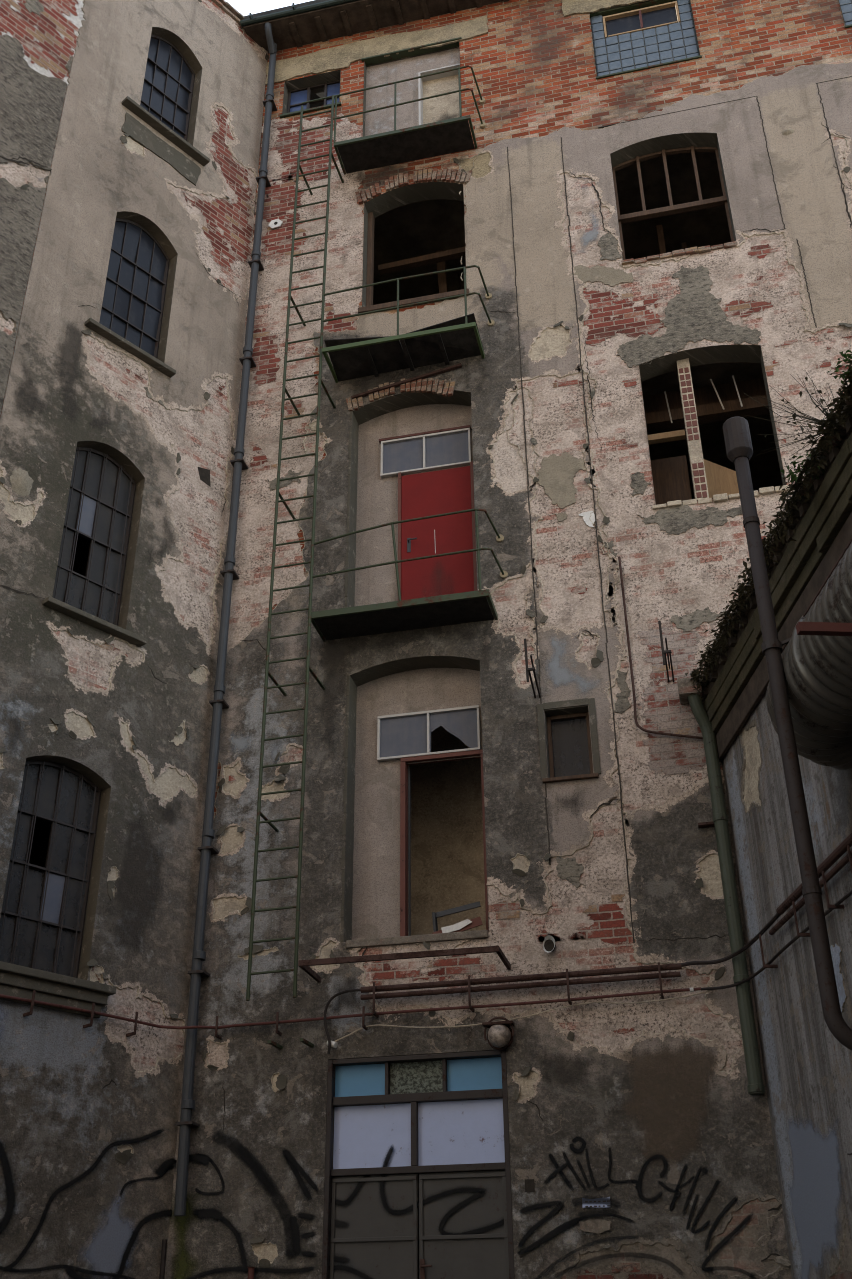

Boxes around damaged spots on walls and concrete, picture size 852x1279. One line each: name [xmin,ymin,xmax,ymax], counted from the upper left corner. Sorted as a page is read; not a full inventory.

flaking render [0,0,86,86]
flaking render [0,161,52,190]
crack [573,174,615,234]
flaking render [81,100,366,685]
crack [583,332,602,449]
flaking render [0,460,47,528]
flaking render [46,620,147,697]
flaking render [310,168,852,1082]
flaking render [118,717,198,809]
damp [118,818,161,949]
flaking render [87,959,185,1079]
flaking render [554,1193,791,1279]